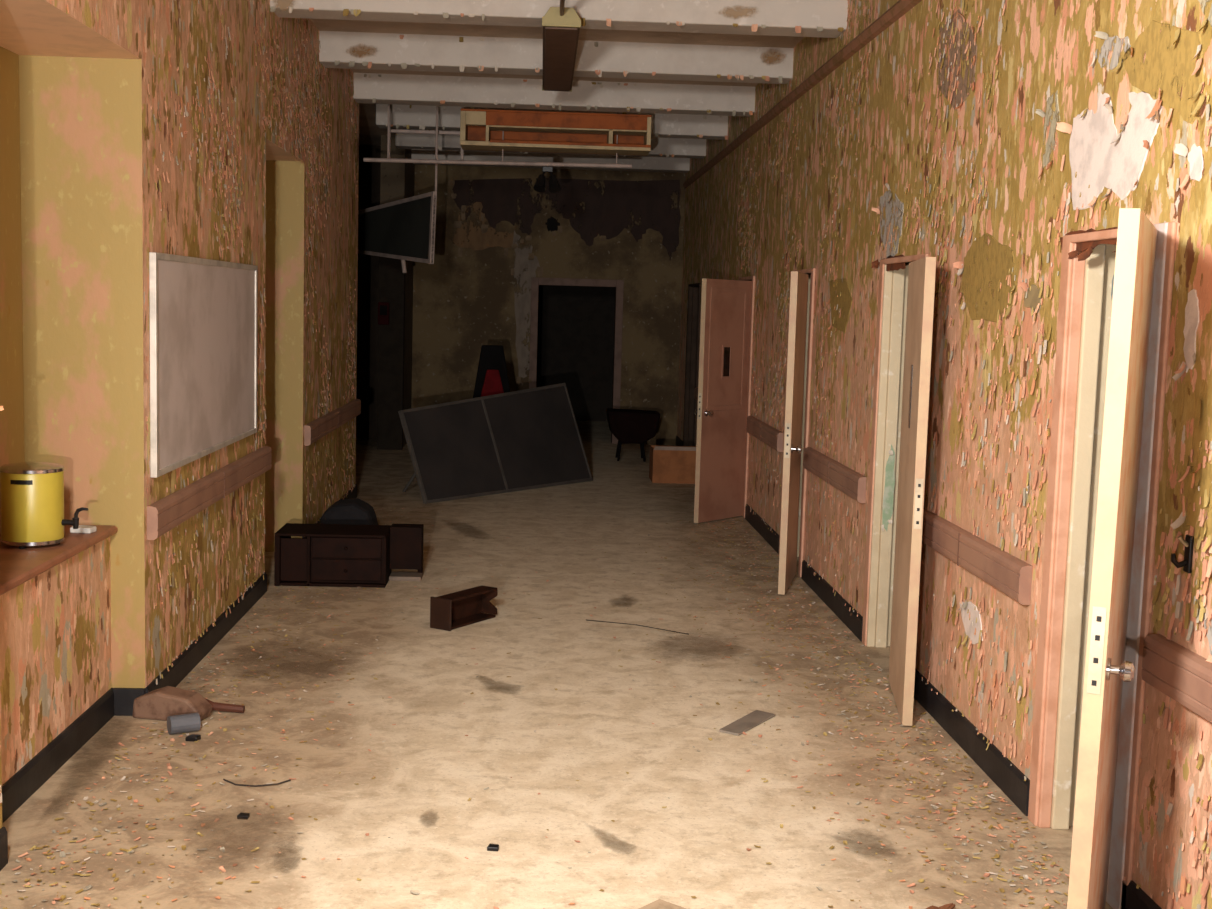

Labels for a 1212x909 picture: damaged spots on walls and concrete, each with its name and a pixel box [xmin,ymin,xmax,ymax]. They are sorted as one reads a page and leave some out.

damp [723,7,755,19]
peeling [251,274,267,452]
peeling [147,0,434,418]
flaking render [448,178,681,385]
peeling [703,26,806,433]
peeling [871,0,1212,564]
peeling [150,480,265,685]
peeling [807,481,858,617]
peeling [927,577,1029,781]
peeling [1142,786,1212,909]
peeling [1149,440,1212,663]
peeling [1194,731,1212,771]